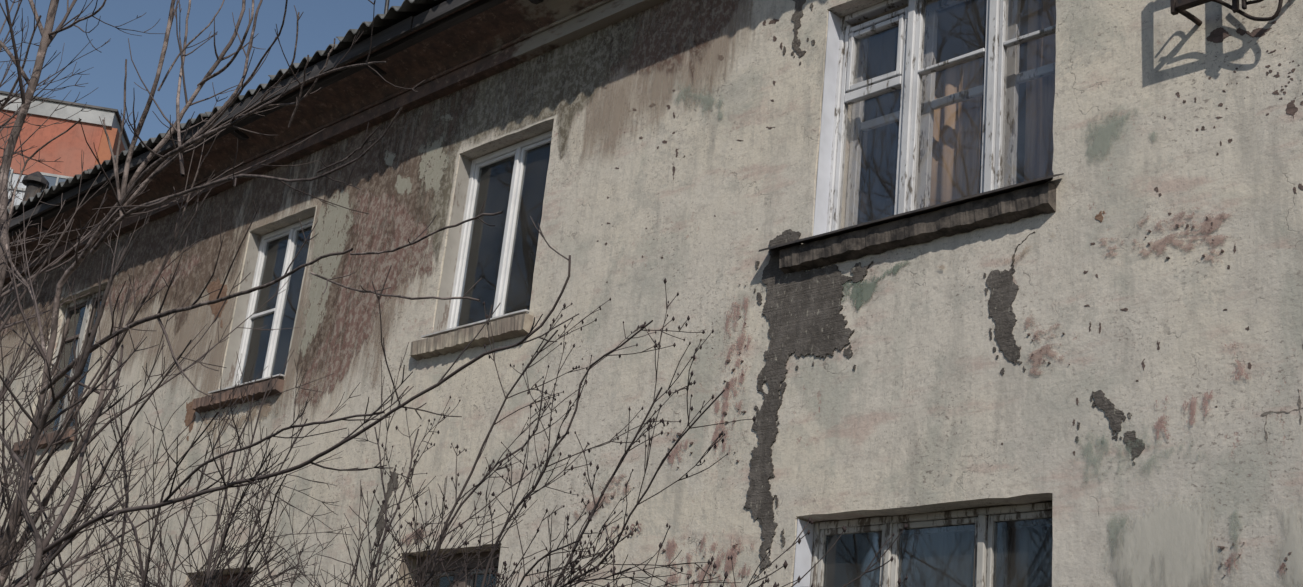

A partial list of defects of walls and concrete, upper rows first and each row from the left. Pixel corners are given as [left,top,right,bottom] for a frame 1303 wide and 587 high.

spalling [762,0,815,66]
peeling [633,90,685,180]
damp [0,0,748,404]
spalling [984,266,1070,376]
peeling [1225,326,1252,380]
spalling [661,229,874,587]
spalling [1072,390,1218,465]